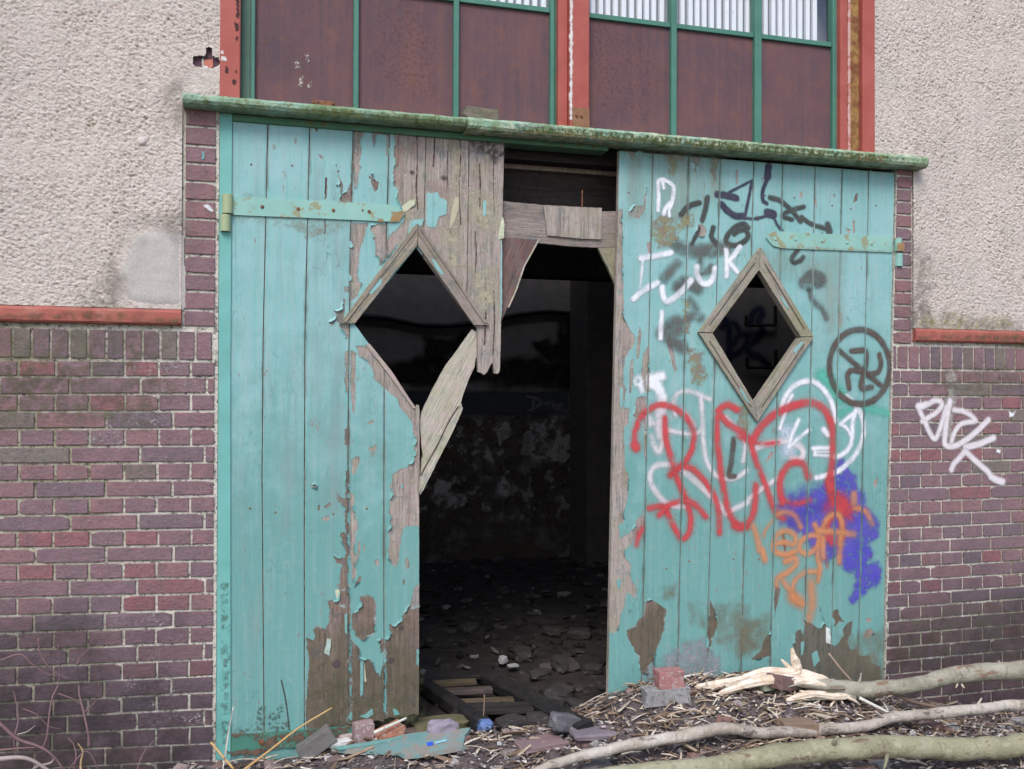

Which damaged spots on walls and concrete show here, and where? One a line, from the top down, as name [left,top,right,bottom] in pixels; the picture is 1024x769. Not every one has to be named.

spalling [193,48,237,84]
corrosion [572,107,590,137]
peeling [305,131,570,729]
peeling [609,204,667,675]
peeling [706,600,718,653]
peeling [751,631,772,661]
peeling [791,607,882,682]